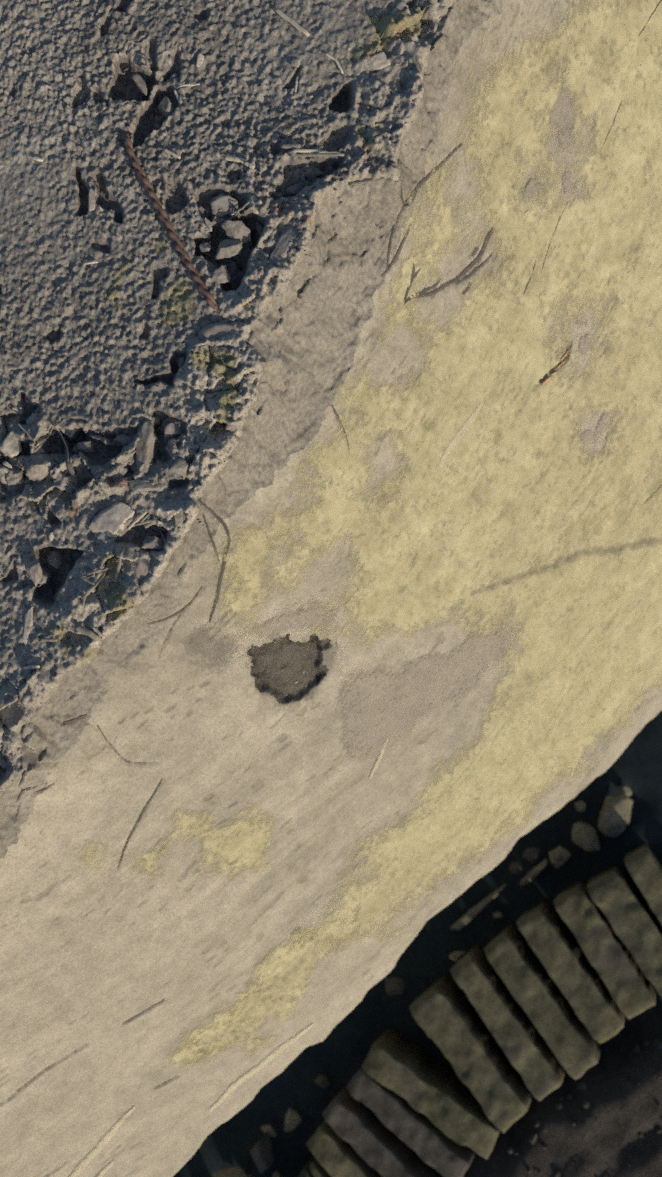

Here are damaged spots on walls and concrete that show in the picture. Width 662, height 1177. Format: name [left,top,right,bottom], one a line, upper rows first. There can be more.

crack [382,144,495,305]
spalling [0,0,503,859]
spalling [541,340,573,386]
crack [148,499,231,658]